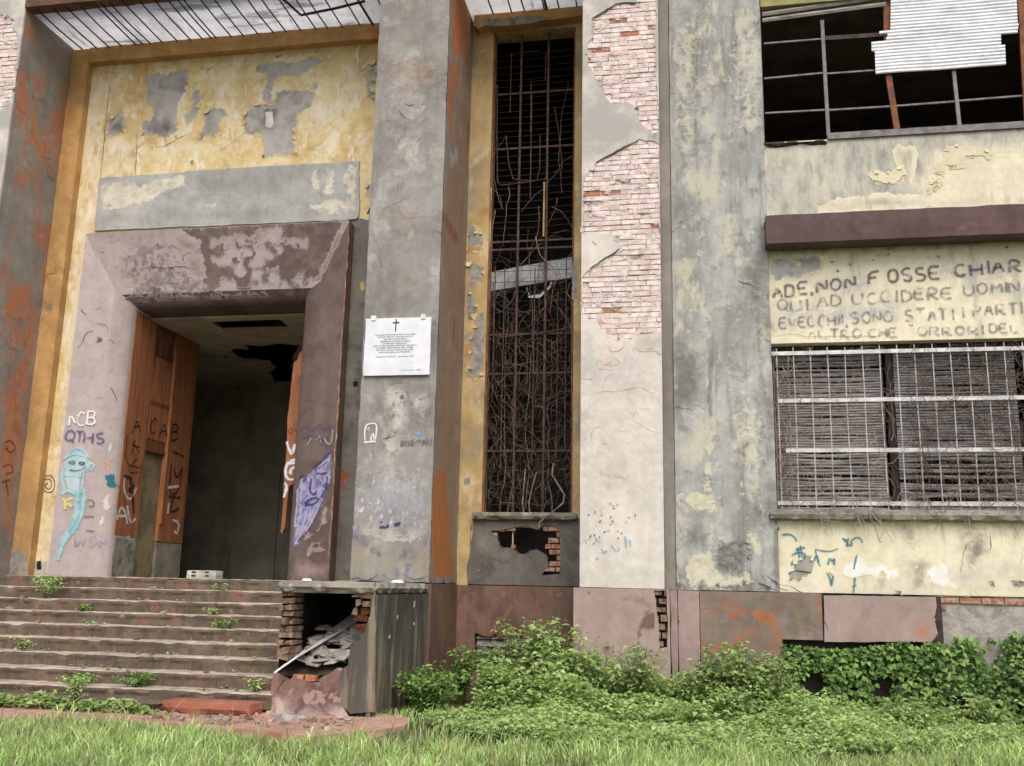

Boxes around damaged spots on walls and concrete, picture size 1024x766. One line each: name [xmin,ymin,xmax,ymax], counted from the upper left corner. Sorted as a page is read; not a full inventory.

spalling [572,0,661,341]
peeling [868,164,907,185]
peeling [927,144,992,194]
peeling [9,48,377,576]
corrosion [430,0,483,584]
peeling [466,226,485,381]
water stain [635,333,709,410]
spalling [278,502,371,679]
spalling [493,525,560,572]
spalling [654,590,668,647]
corrosion [727,607,780,631]
water stain [676,388,1024,630]